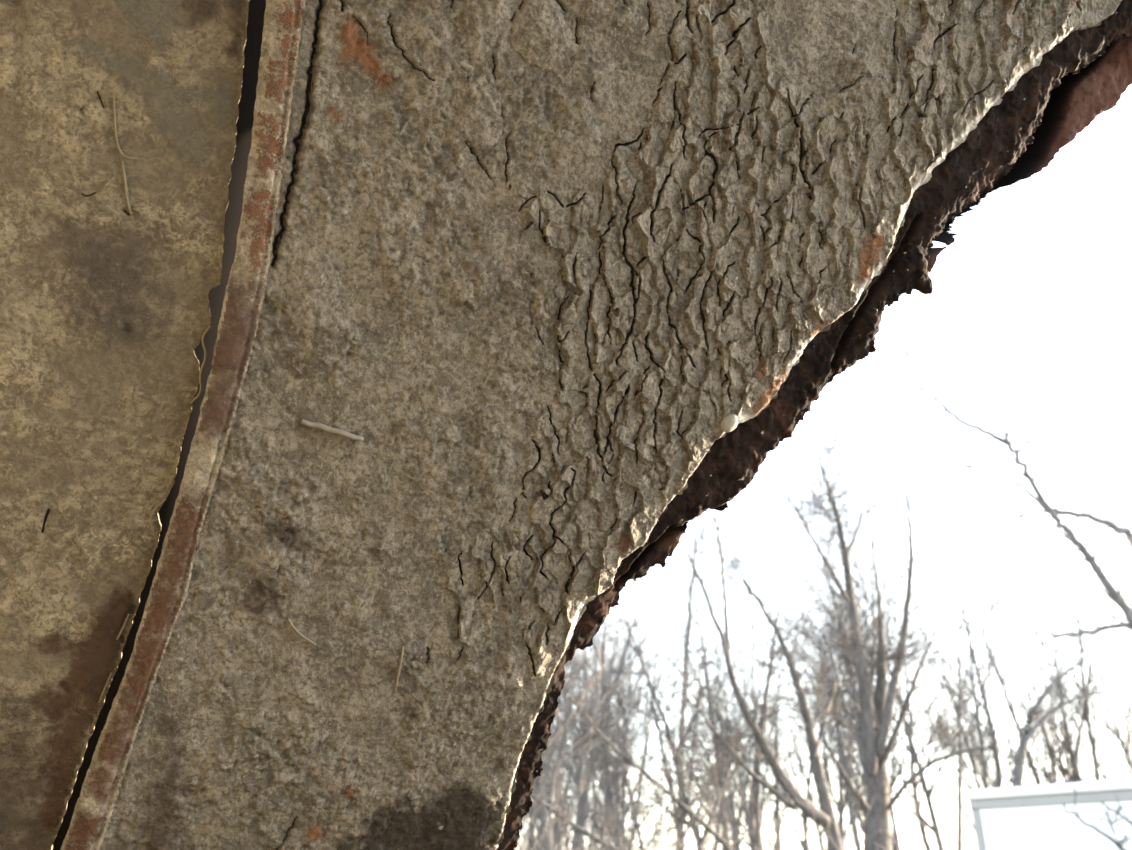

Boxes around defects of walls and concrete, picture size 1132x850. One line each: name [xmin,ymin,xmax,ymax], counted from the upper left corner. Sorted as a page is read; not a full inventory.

rust [241,0,303,276]
crack [271,0,435,266]
rust [337,16,393,89]
crack [466,131,584,243]
crack [530,0,864,476]
peeling [428,0,1103,683]
crack [886,0,954,132]
crack [42,509,50,533]
rust [40,493,209,850]
crack [458,405,585,676]
leakage [338,781,502,850]